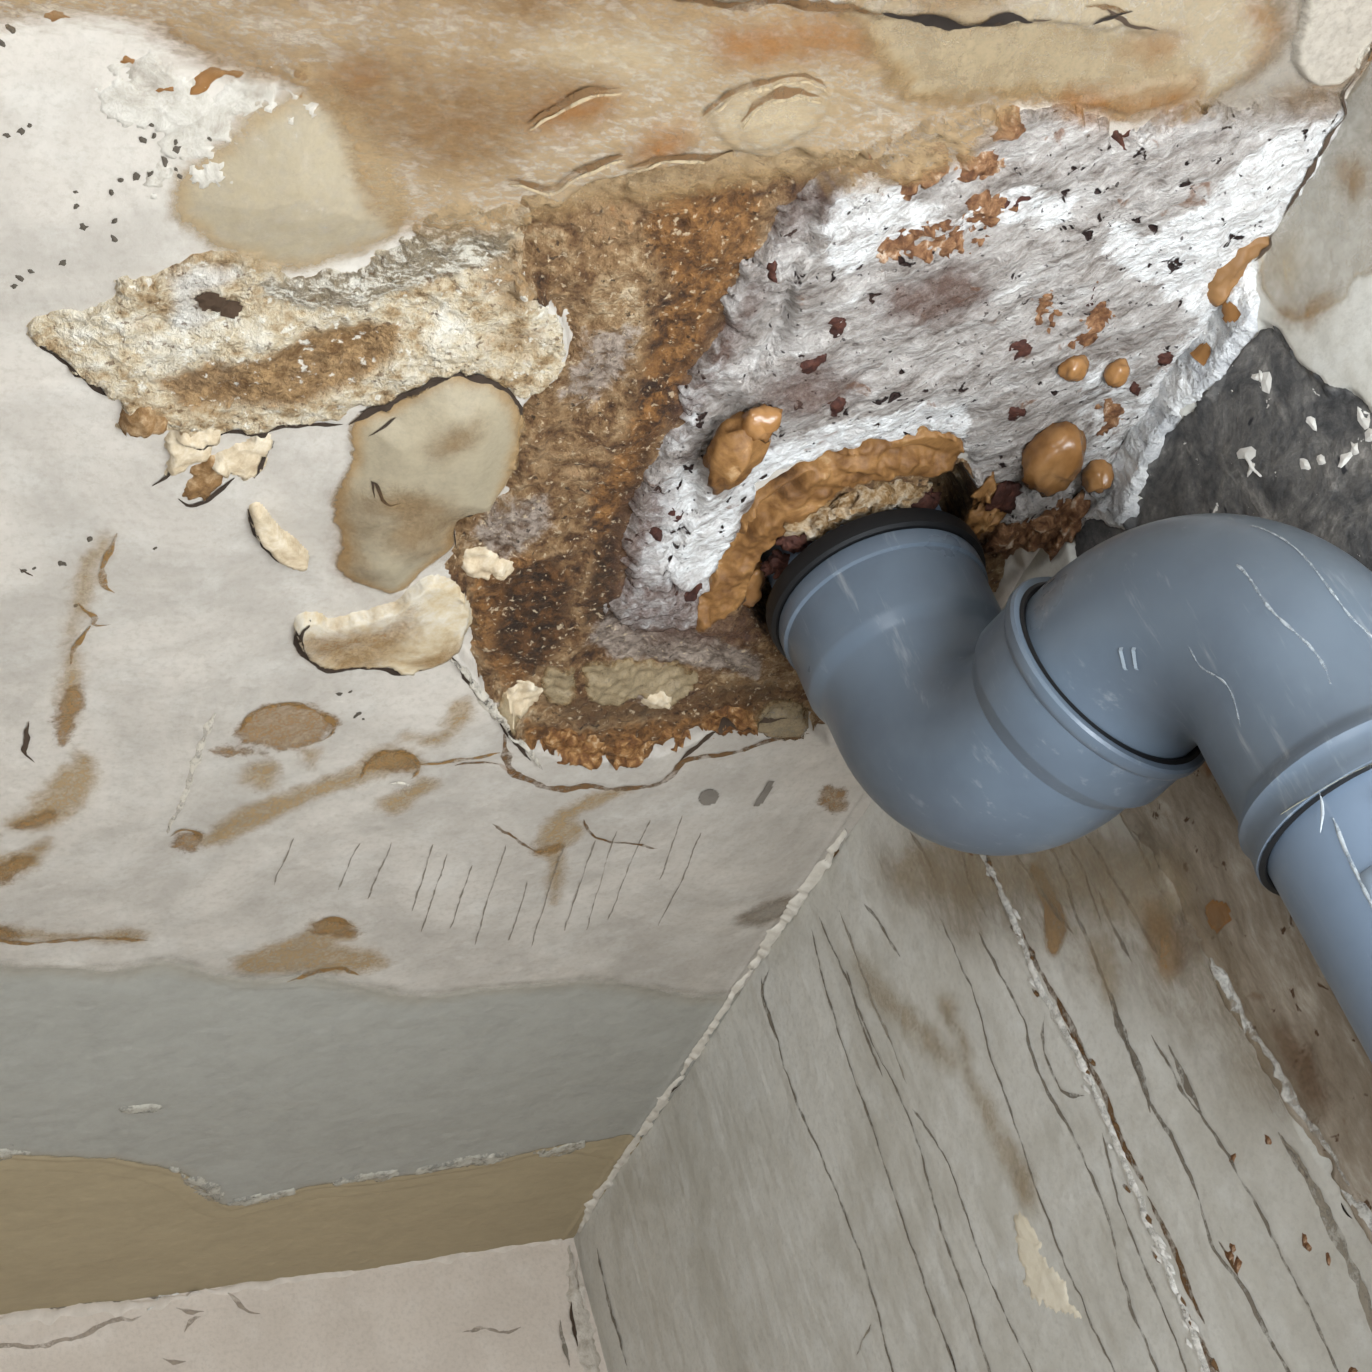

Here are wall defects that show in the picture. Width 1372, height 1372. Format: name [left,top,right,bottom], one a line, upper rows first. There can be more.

crack [674,0,1049,31]
peeling [1291,0,1372,86]
damp [0,0,1372,641]
spalling [26,147,858,771]
spalling [828,458,977,521]
spalling [979,535,1005,592]
peeling [1075,326,1372,572]
flaking render [0,1134,642,1332]
crack [943,848,1339,1372]
crack [1210,958,1372,1332]